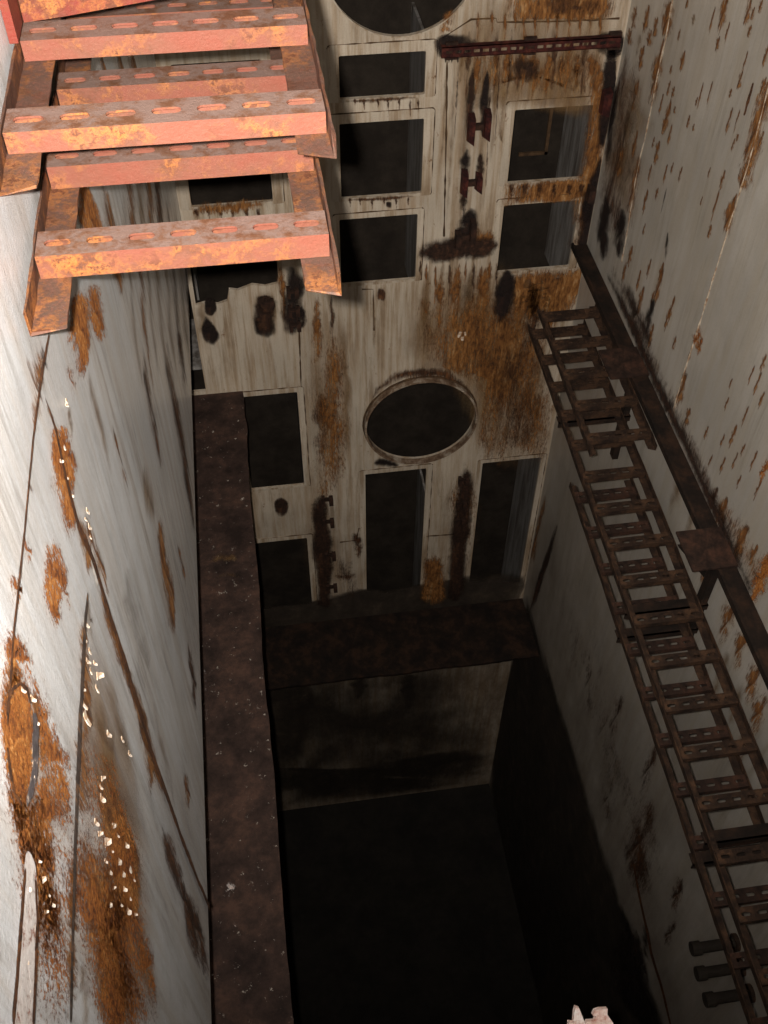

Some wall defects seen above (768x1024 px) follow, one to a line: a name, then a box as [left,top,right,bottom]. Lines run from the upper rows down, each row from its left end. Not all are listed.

rust [67,285,106,394]
rust [77,187,116,228]
rust [127,182,170,225]
leakage [254,267,306,334]
rust [312,300,349,495]
leakage [419,196,515,322]
rust [375,268,582,460]
rust [461,0,685,243]
rust [612,246,768,603]
rust [43,544,70,625]
rust [2,640,157,1024]
leakage [260,472,661,1024]